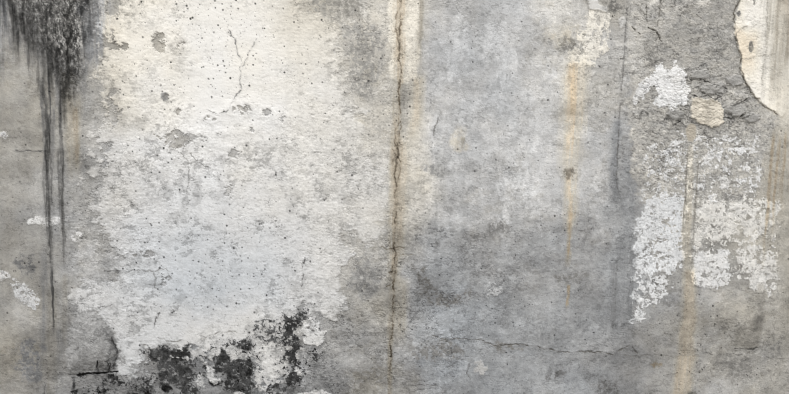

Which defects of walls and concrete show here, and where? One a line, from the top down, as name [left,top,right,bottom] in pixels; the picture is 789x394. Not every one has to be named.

damp [0,0,116,394]
damp [70,305,331,394]
peeling [68,0,389,391]
crack [381,0,437,394]
crack [432,111,441,137]
crack [431,318,672,358]
flaking render [577,0,789,322]